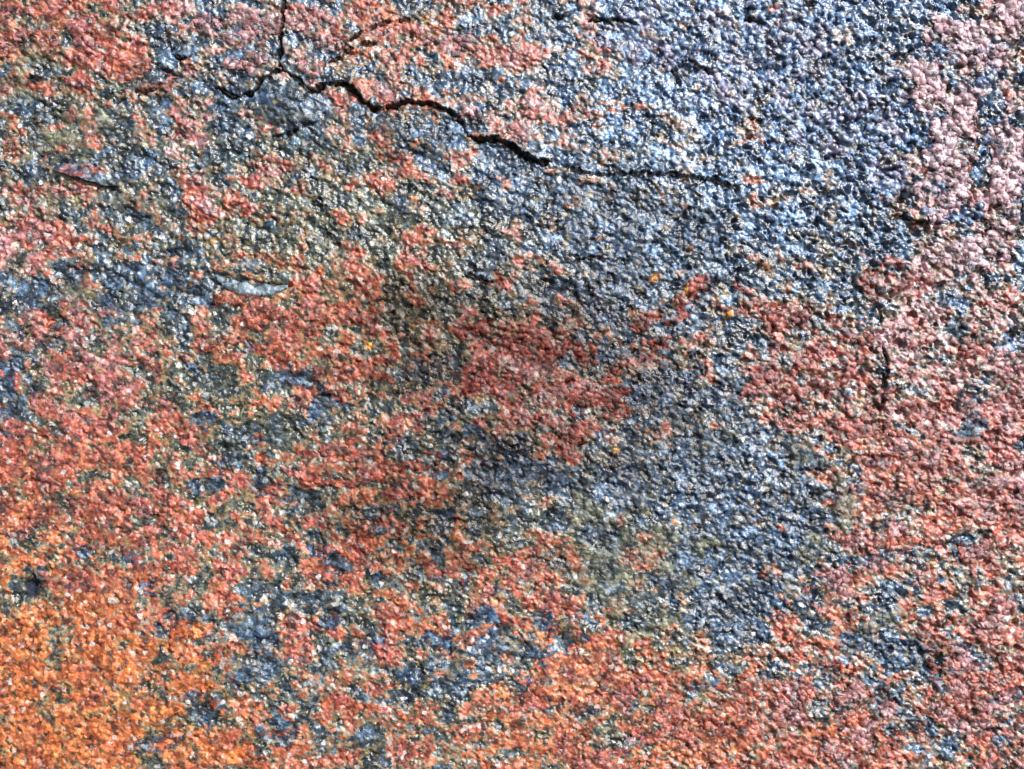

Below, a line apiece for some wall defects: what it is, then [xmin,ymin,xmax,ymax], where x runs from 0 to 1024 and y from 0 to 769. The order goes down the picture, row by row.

crack [553,8,630,23]
crack [166,34,189,60]
crack [218,0,552,166]
crack [663,56,714,86]